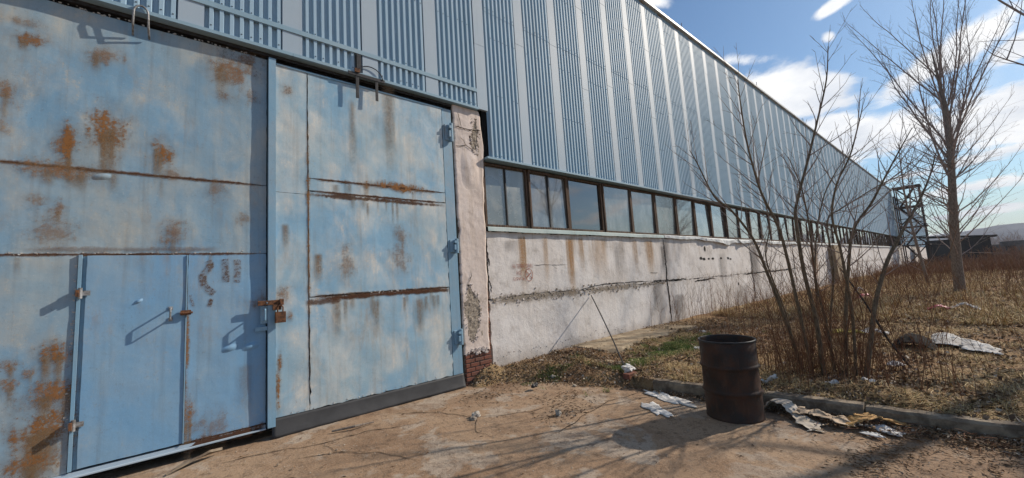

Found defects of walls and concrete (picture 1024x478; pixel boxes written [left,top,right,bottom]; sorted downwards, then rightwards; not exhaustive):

corrosion [18,31,43,47]
corrosion [210,55,254,84]
corrosion [0,108,247,185]
flaking render [470,119,480,156]
corrosion [306,176,448,317]
flaking render [463,280,666,382]
corrosion [0,339,78,478]